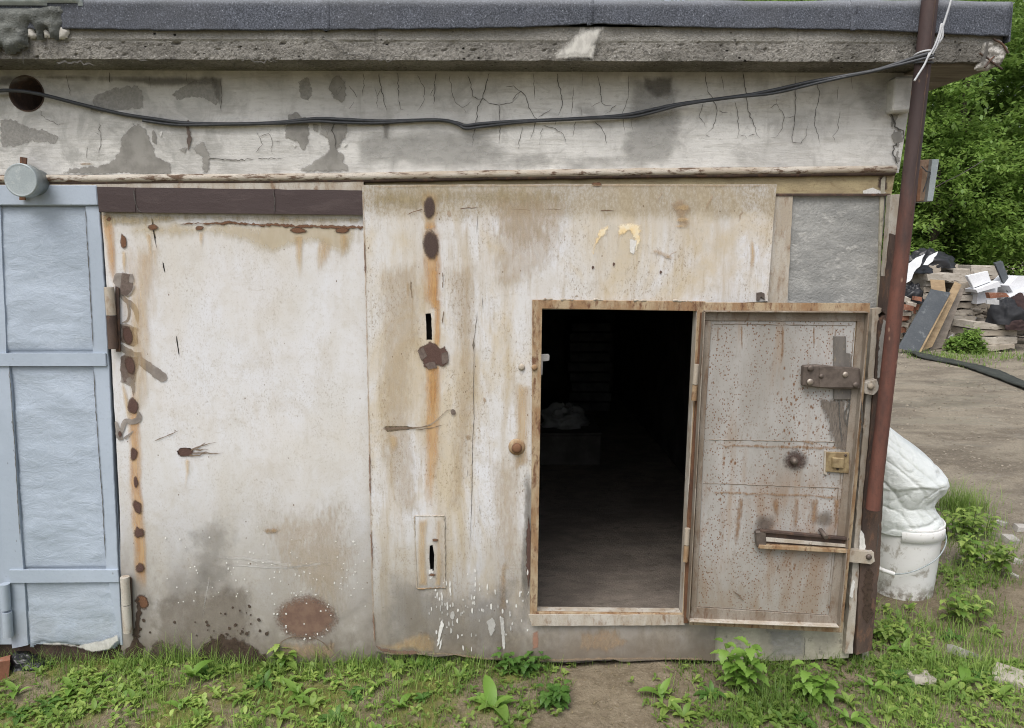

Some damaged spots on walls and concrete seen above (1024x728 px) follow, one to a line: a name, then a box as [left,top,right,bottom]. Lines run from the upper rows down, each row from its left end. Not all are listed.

crack [322,38,633,144]
crack [699,58,853,143]
peeling [0,119,58,147]
peeling [67,123,171,174]
peeling [180,142,210,172]
peeling [285,112,348,172]
corrosion [49,172,896,479]
corrosion [104,216,366,574]
corrosion [124,595,151,659]
leakage [151,641,178,662]
leakage [194,605,269,665]
corrosion [273,591,335,656]